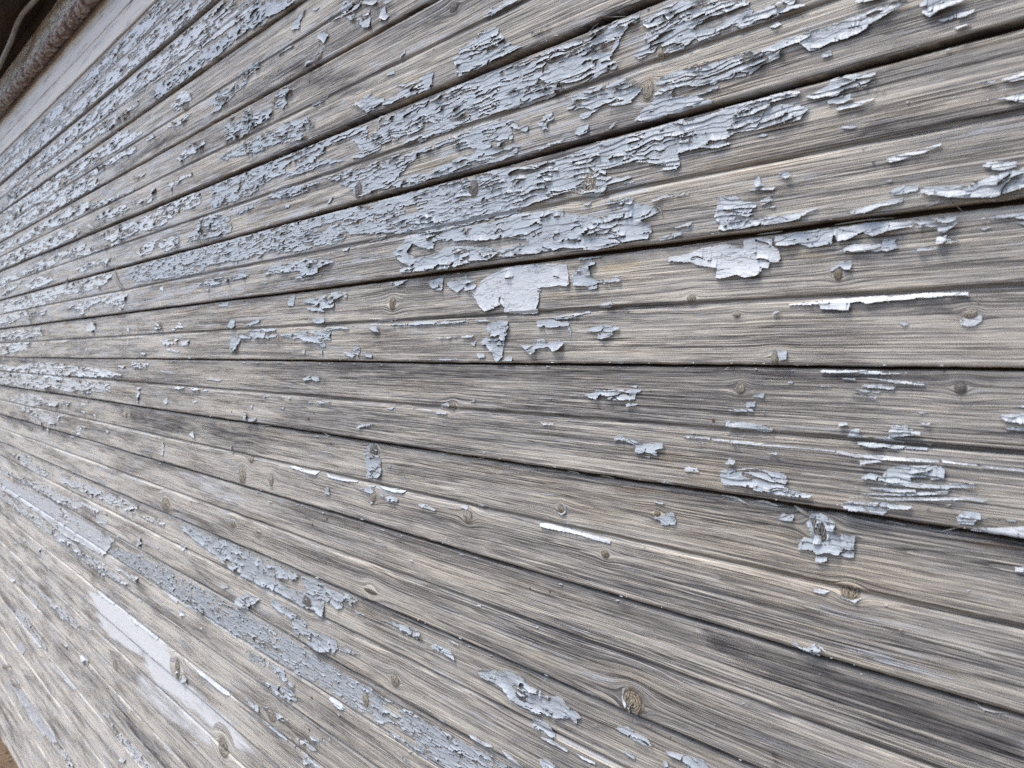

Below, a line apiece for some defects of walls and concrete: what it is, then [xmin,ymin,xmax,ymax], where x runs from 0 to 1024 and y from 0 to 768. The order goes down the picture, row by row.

peeling [0,0,1024,435]
peeling [0,444,523,768]
peeling [798,513,855,563]
peeling [683,393,1024,538]
peeling [478,670,595,765]